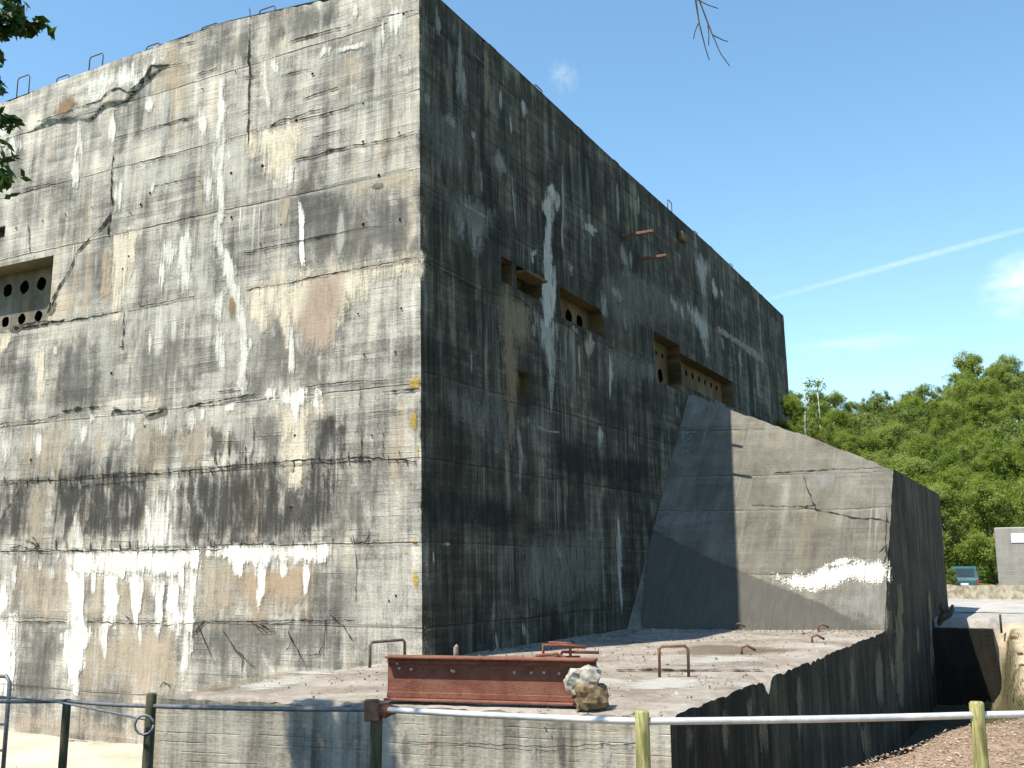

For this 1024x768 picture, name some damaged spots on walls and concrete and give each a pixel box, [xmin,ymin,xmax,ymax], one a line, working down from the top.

crack [38,41,217,121]
crack [243,7,415,160]
water stain [381,0,411,49]
crack [14,115,201,348]
water stain [0,54,424,490]
water stain [530,170,573,409]
water stain [0,482,406,706]
water stain [630,511,904,704]
crack [758,467,889,564]